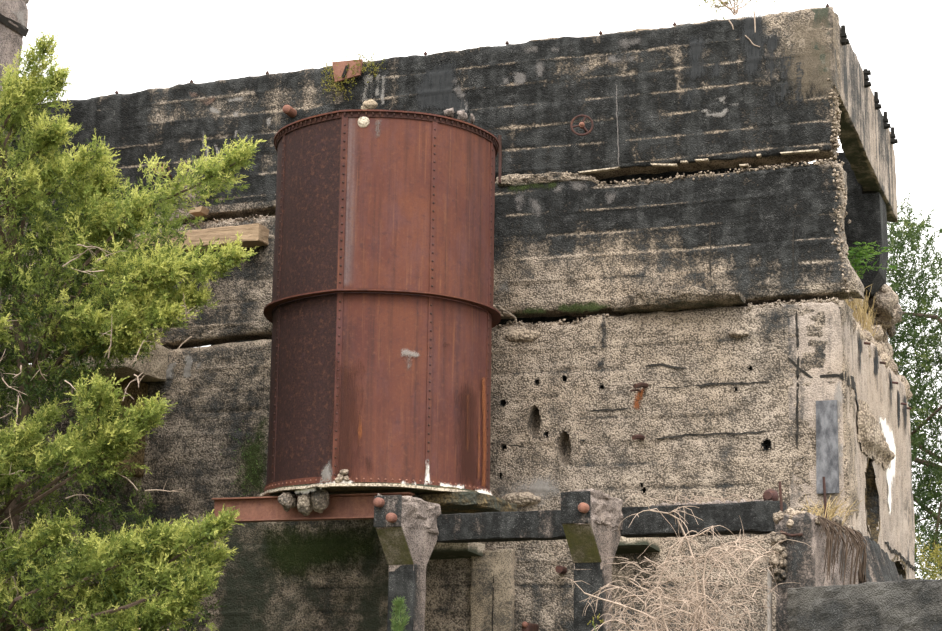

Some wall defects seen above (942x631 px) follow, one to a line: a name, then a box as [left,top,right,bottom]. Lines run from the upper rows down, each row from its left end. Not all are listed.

spalling [827,78,853,302]
corrosion [459,378,486,486]
spalling [856,399,895,471]
spalling [857,329,911,429]